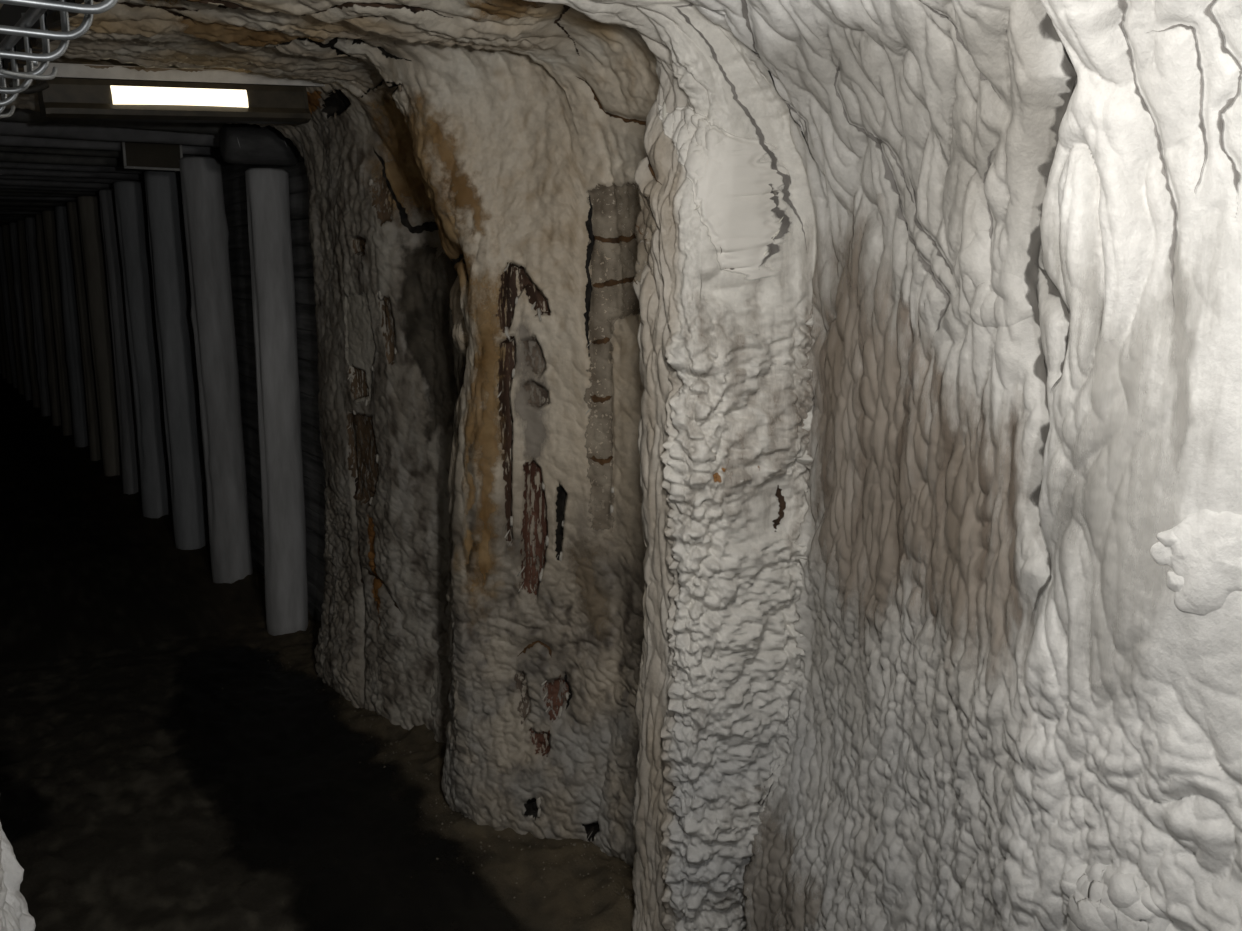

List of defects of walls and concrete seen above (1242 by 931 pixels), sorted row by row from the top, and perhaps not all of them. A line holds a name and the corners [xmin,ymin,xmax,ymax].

water stain [398,245,466,441]
spalling [496,262,562,600]
spalling [584,182,658,531]
crack [720,184,790,270]
water stain [770,226,1023,670]
water stain [1054,277,1173,683]
water stain [1169,248,1190,467]